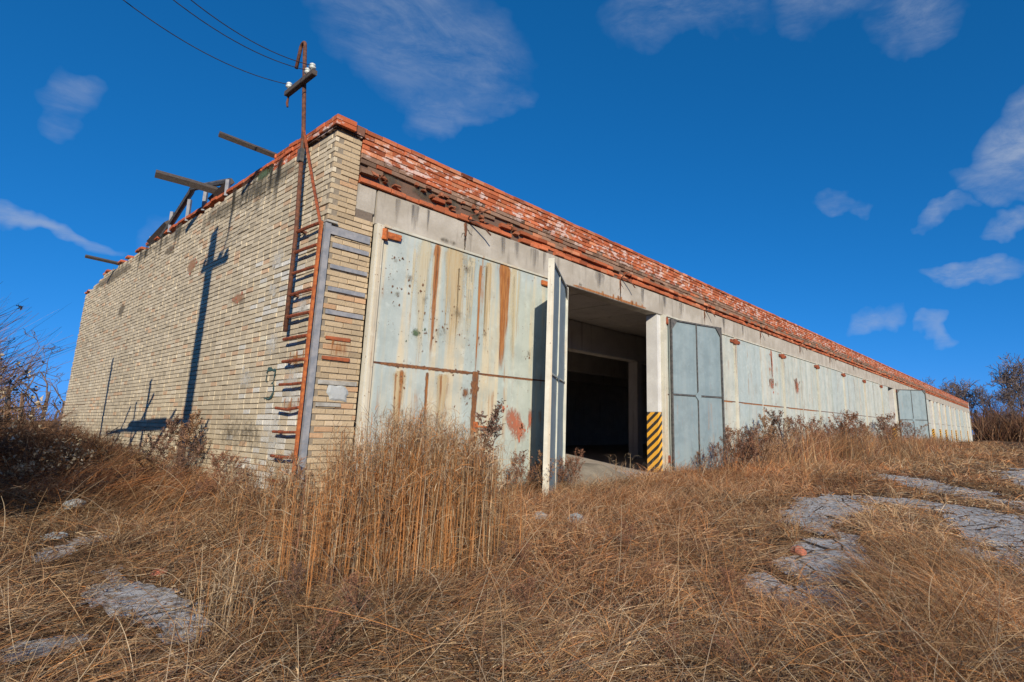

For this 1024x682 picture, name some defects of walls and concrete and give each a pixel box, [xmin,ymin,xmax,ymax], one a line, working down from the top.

leakage [209,159,289,221]
spalling [371,170,485,222]
rust [431,244,440,344]
rust [499,264,510,361]
rust [380,362,533,431]
rust [724,351,814,426]